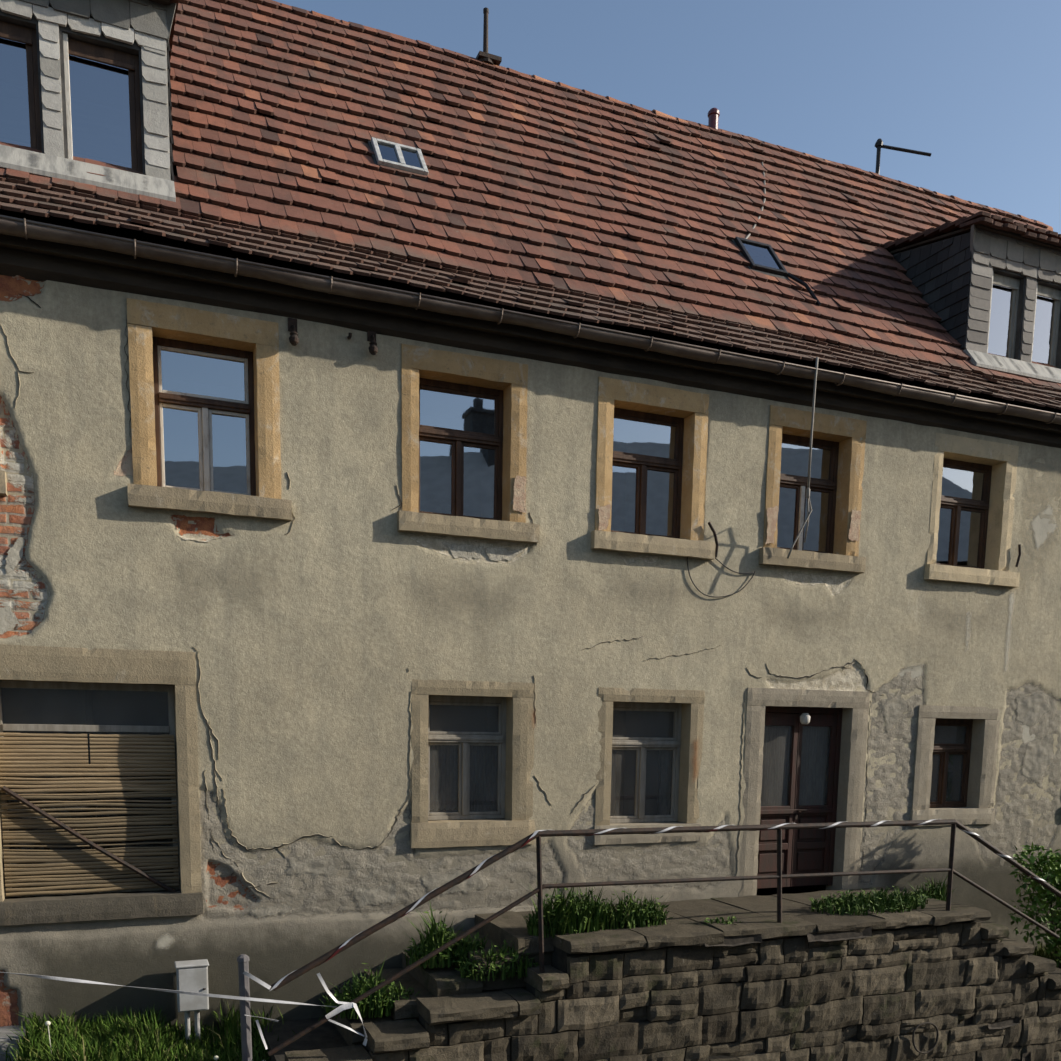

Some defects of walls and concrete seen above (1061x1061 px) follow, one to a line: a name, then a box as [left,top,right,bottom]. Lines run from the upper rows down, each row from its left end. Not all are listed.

spalling [0,275,44,301]
crack [0,324,34,407]
spalling [0,396,50,638]
spalling [171,515,231,542]
peeling [1032,507,1056,547]
crack [193,647,412,898]
crack [736,659,875,875]
spalling [766,663,925,884]
spalling [968,683,1061,868]
spalling [199,791,565,919]
spalling [567,794,733,890]
spalling [0,970,19,1027]